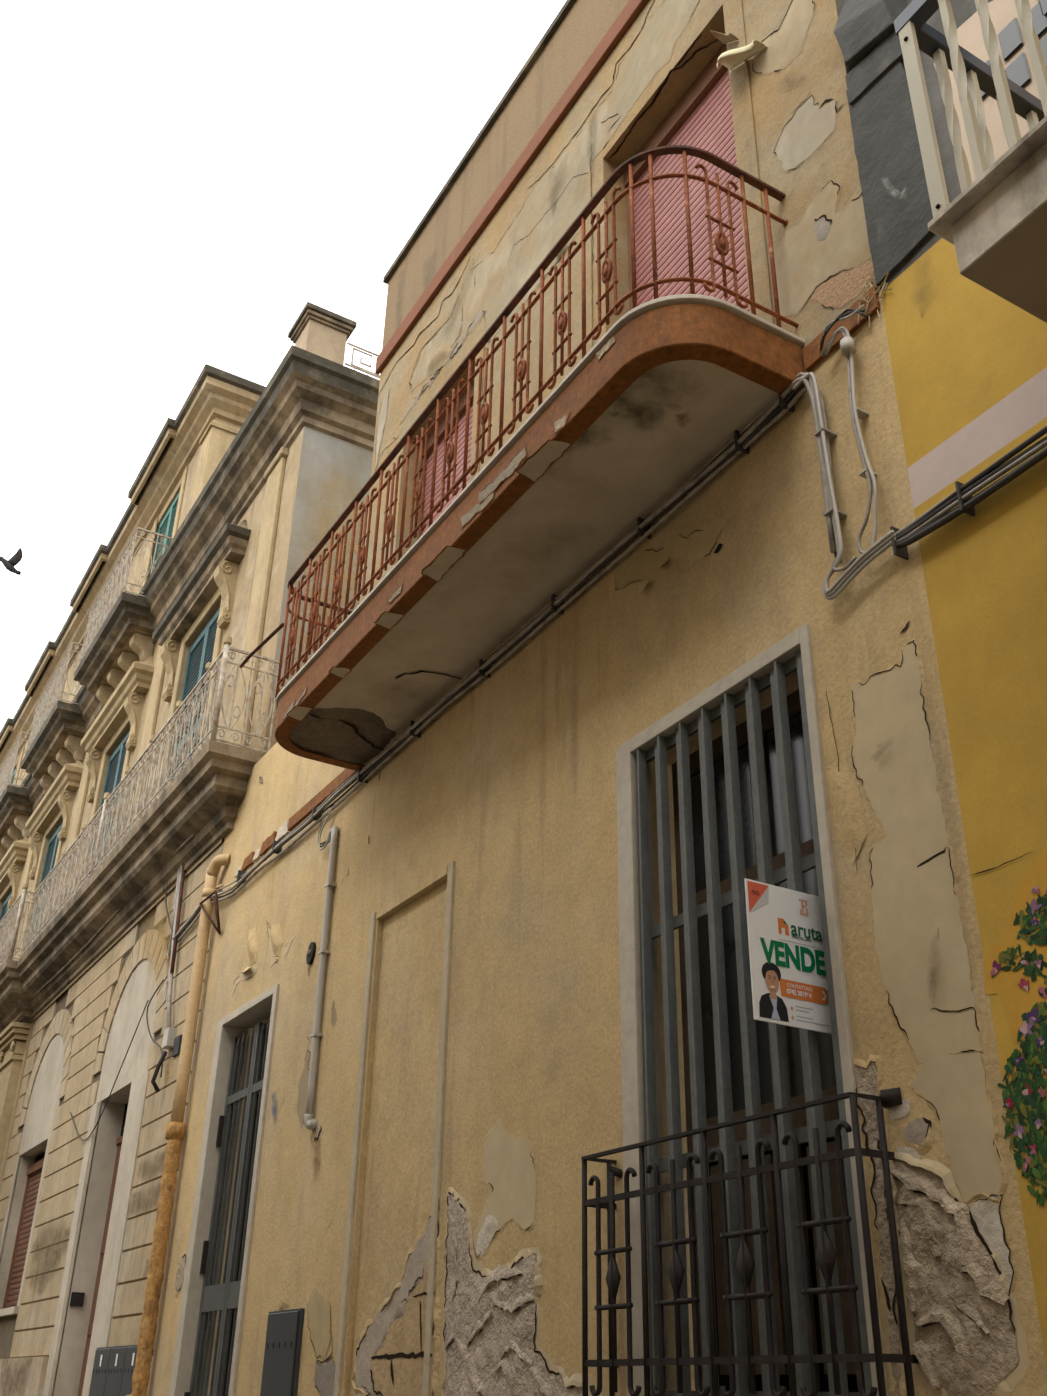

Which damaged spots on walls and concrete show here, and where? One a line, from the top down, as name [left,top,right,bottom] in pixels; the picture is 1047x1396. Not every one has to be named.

flaking render [710,0,817,76]
flaking render [773,93,838,173]
spalling [282,686,401,765]
crack [826,690,839,772]
flaking render [850,638,1029,1396]
spalling [314,1118,592,1396]